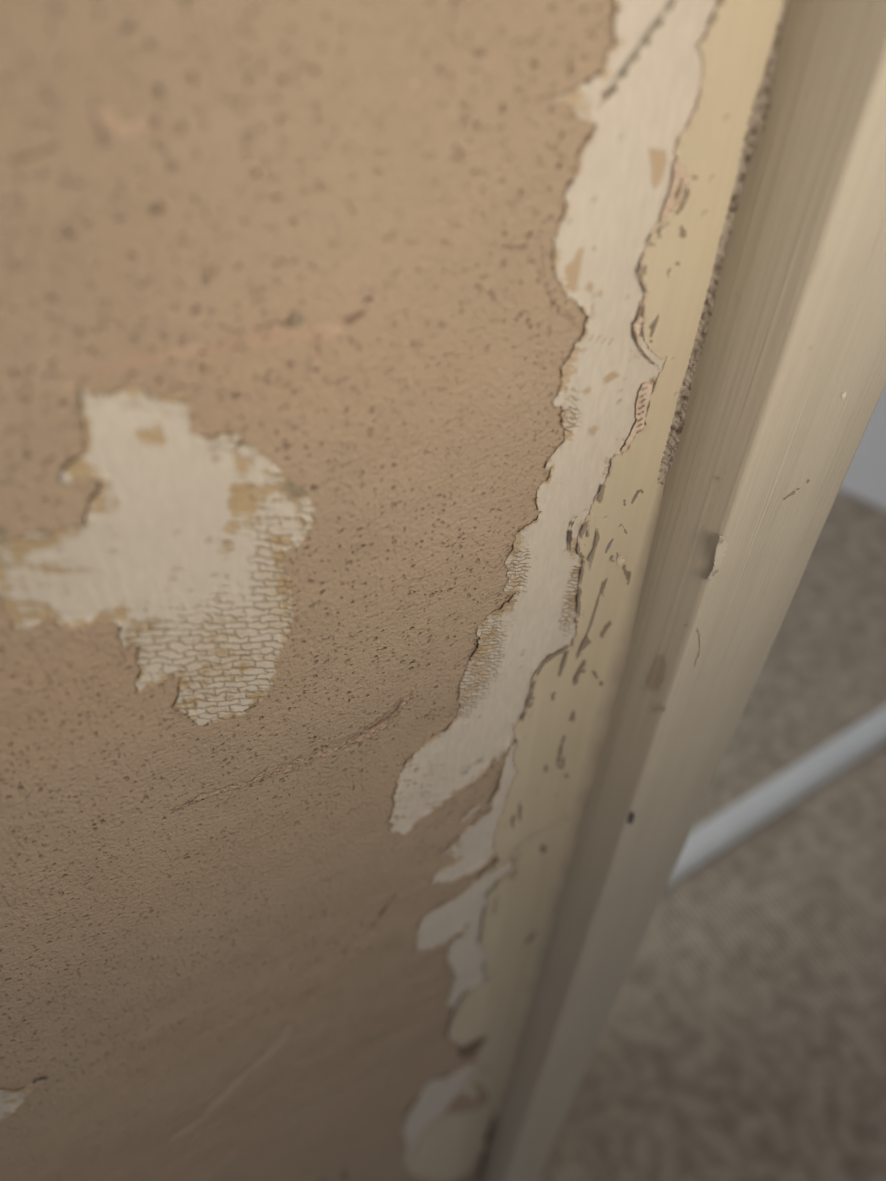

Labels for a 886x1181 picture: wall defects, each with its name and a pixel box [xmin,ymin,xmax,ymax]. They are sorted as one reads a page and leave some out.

peeling [406,0,783,1181]